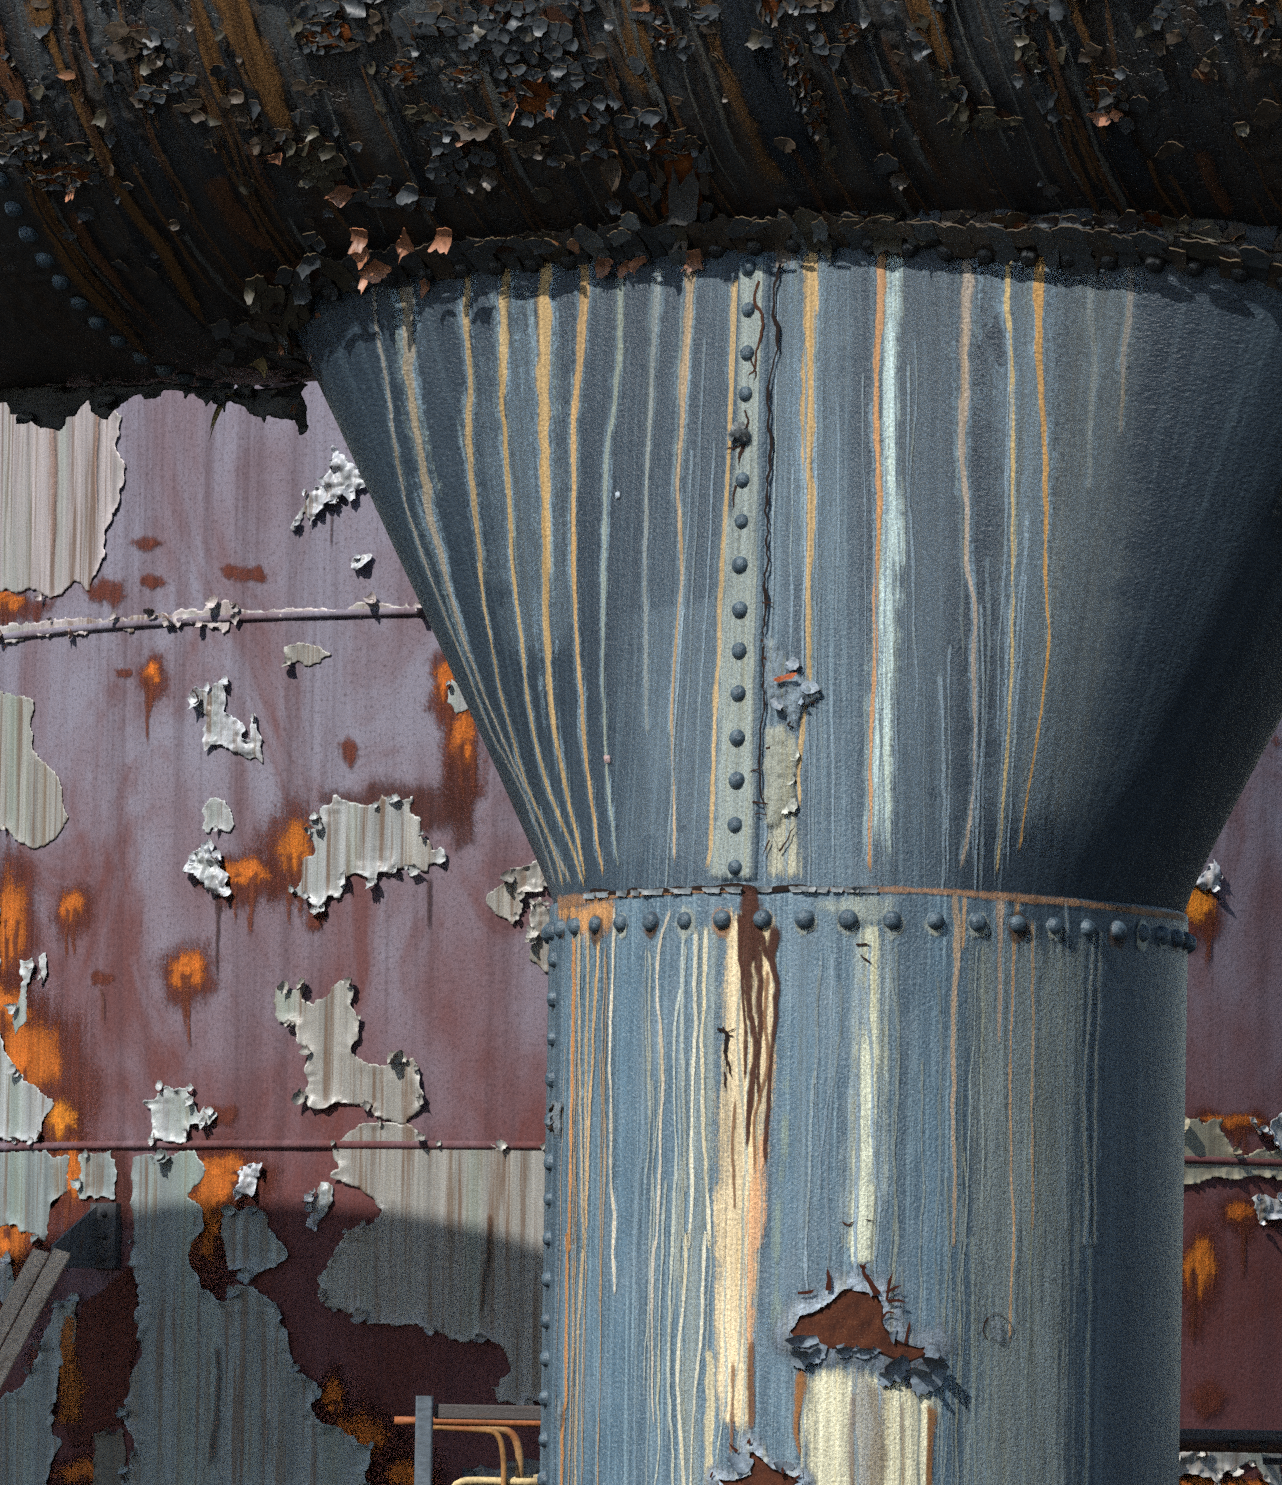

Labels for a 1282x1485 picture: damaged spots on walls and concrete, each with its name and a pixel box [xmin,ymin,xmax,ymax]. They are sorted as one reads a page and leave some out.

rust [360,40,447,228]
peeling [0,0,1282,440]
peeling [0,401,126,600]
peeling [290,445,366,531]
crack [583,264,878,901]
rust [0,834,132,1309]
rust [36,1267,138,1485]
peeling [0,952,374,1485]
peeling [288,793,446,915]
peeling [273,977,545,1406]
rust [160,260,780,1485]
rust [865,253,1226,1483]